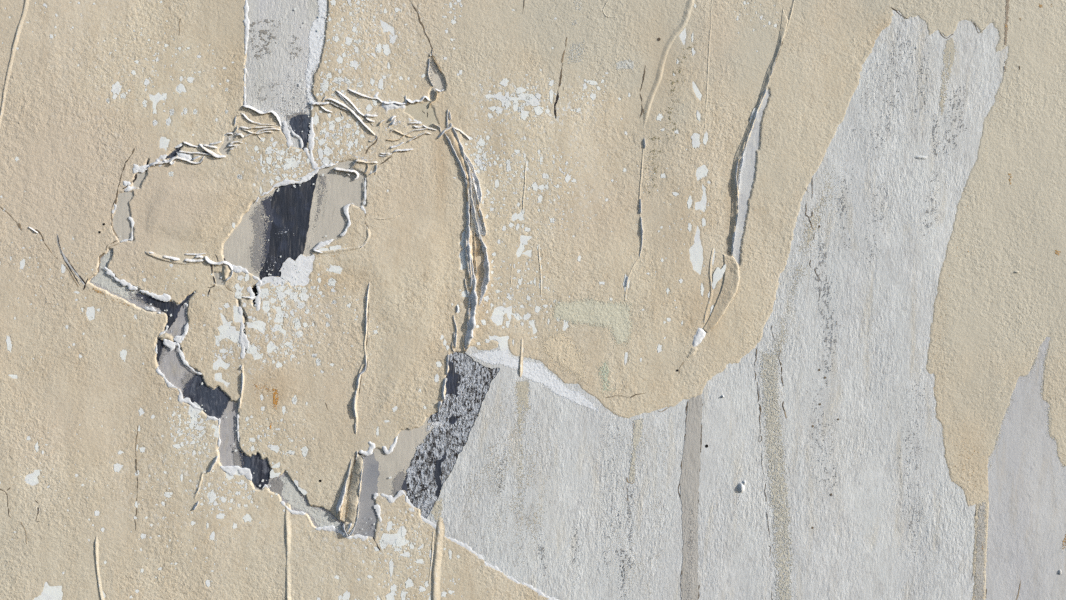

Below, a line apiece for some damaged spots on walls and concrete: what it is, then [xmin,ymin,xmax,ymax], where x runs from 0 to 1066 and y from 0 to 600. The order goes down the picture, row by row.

crack [410,0,433,56]
crack [554,38,567,117]
peeling [679,28,696,55]
peeling [0,0,691,600]
peeling [646,81,770,325]
peeling [697,10,1008,600]
peeling [985,337,1066,600]